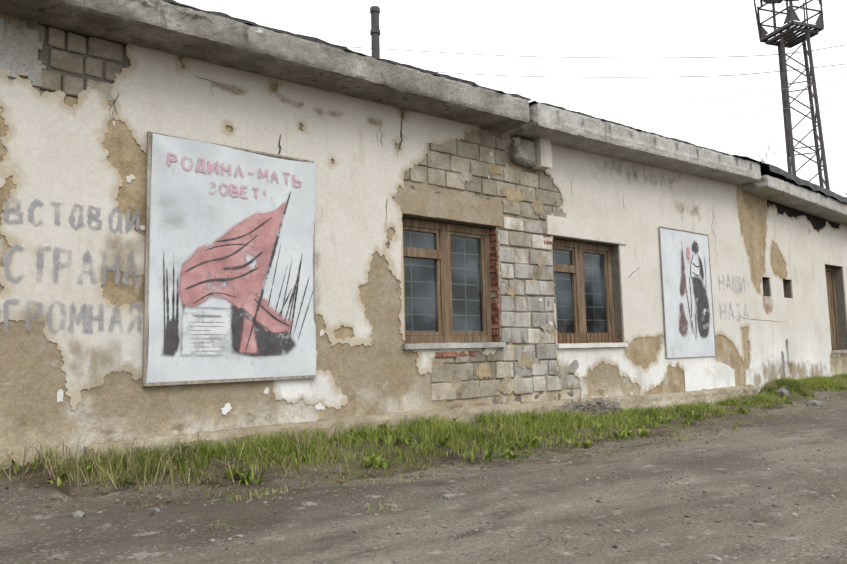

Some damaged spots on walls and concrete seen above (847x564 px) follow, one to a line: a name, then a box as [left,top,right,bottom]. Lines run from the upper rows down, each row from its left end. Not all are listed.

flaking render [0,107,9,162]
crack [377,112,405,158]
flaking render [102,119,152,236]
flaking render [0,175,17,267]
flaking render [736,184,840,293]
flaking render [0,231,477,469]
flaking render [625,334,663,369]
flaking render [714,327,750,386]
flaking render [555,361,685,417]